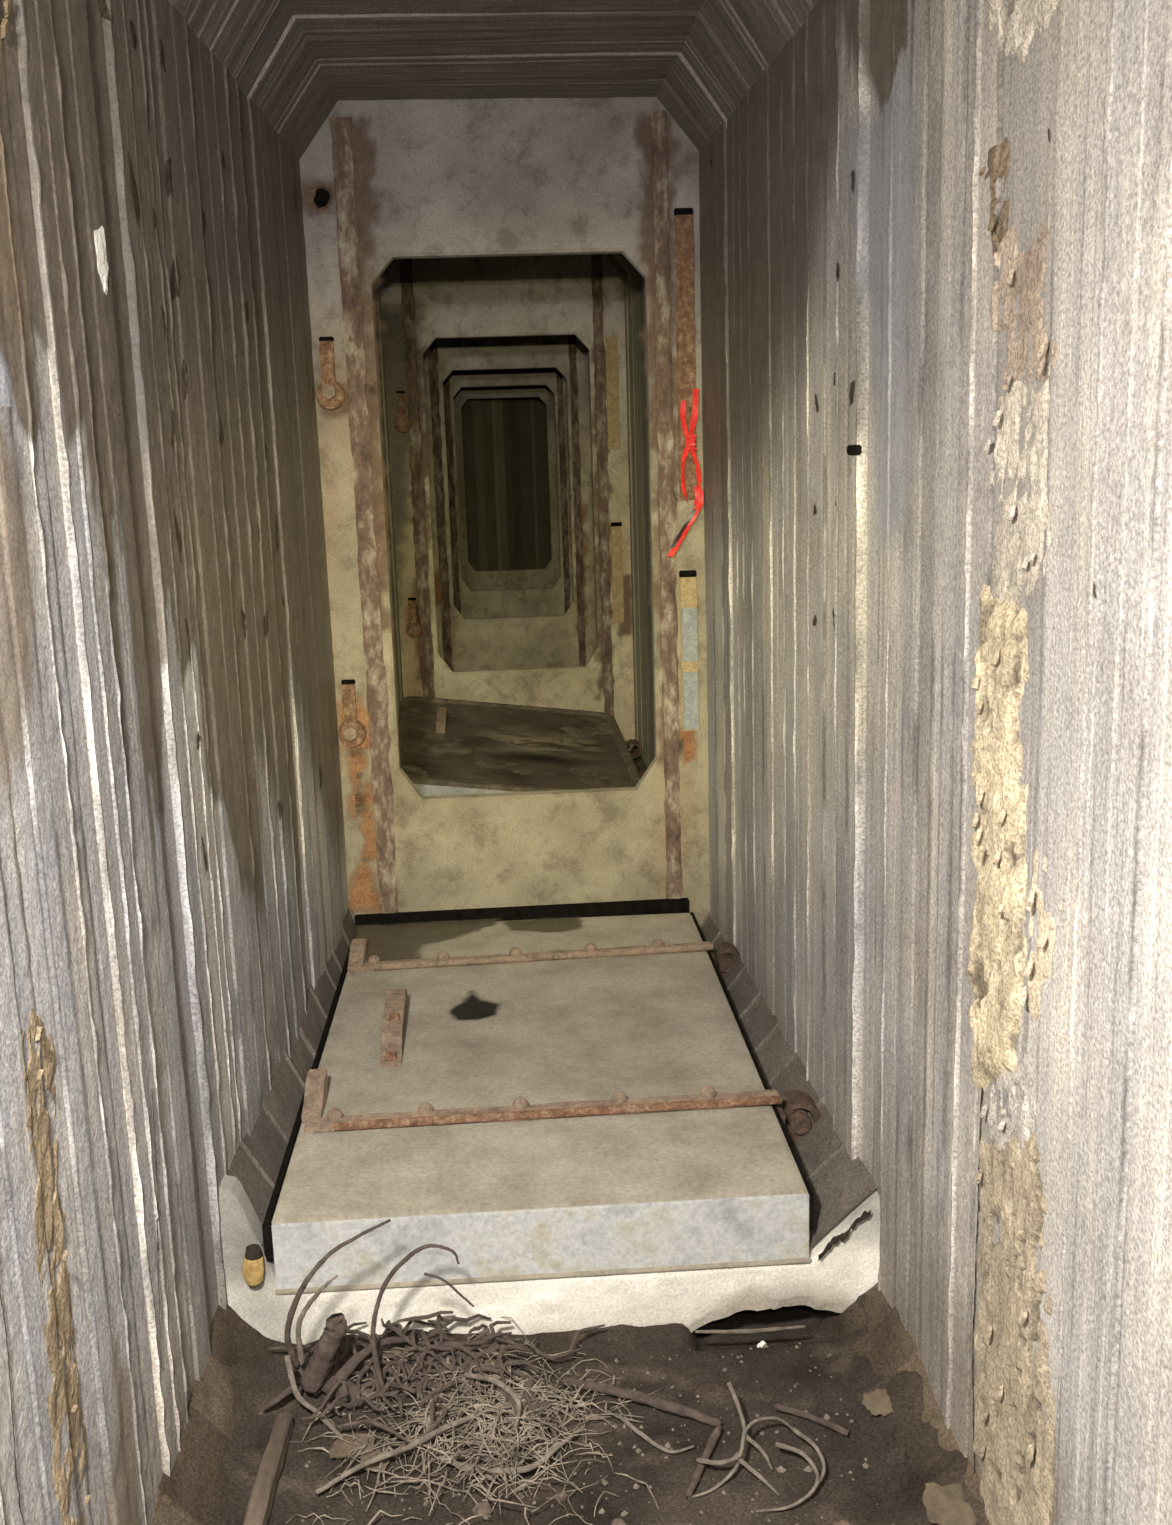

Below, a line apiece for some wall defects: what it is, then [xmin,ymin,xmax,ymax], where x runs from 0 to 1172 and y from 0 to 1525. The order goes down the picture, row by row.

spalling [984,0,1059,63]
corrosion [306,183,335,212]
corrosion [350,121,389,629]
corrosion [637,116,678,549]
corrosion [592,350,632,689]
corrosion [340,705,379,909]
corrosion [661,707,696,761]
spalling [922,137,1063,1525]
leakage [451,995,498,1020]